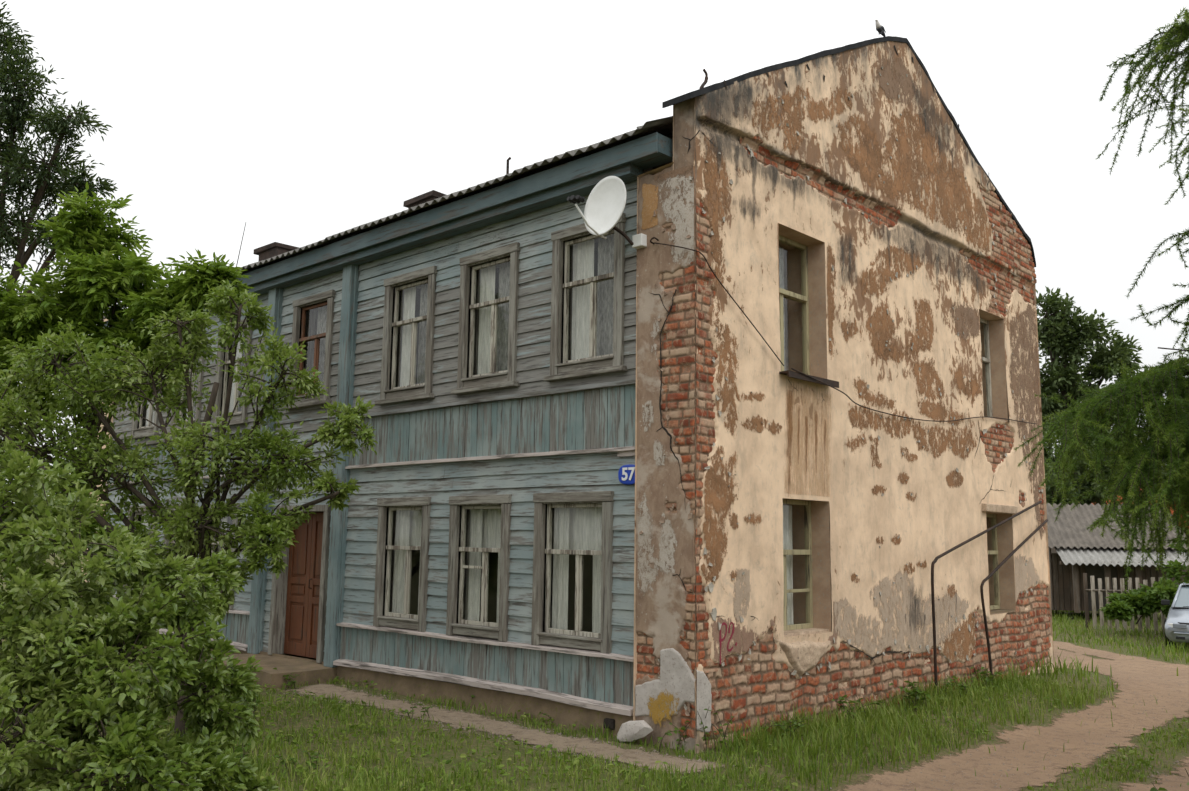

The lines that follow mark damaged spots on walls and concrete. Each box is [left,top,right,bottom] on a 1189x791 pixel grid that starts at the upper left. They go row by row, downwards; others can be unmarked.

flaking render [637,136,1051,751]
peeling [740,56,1045,539]